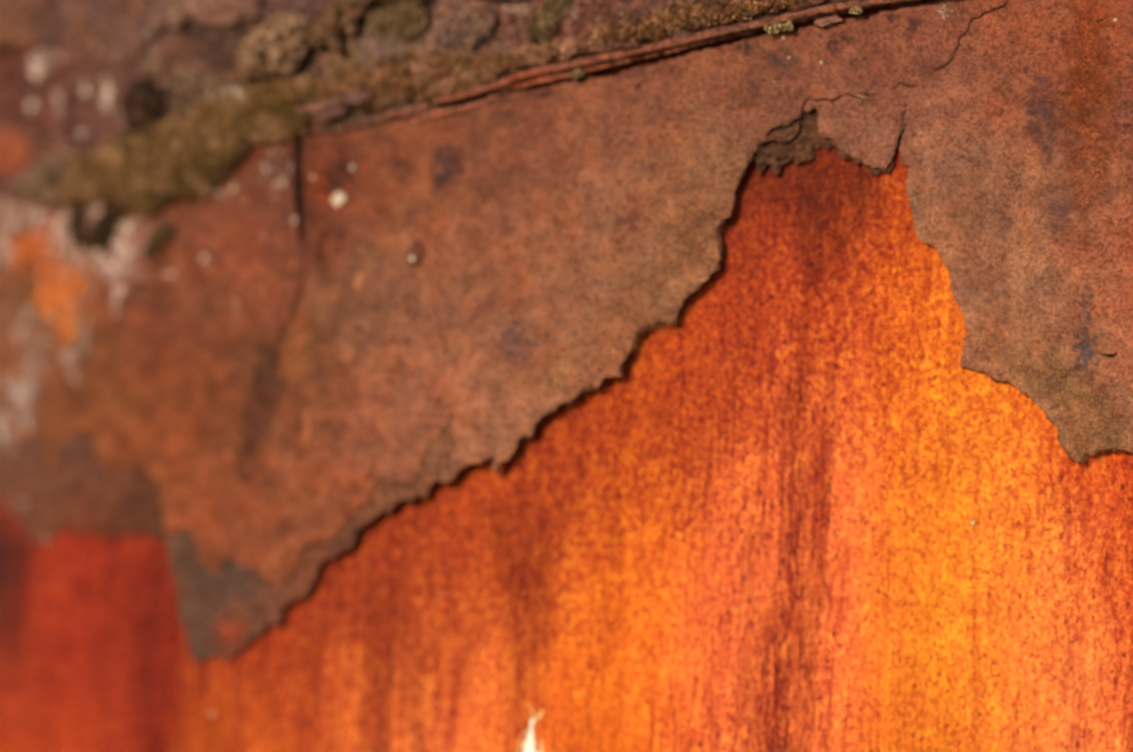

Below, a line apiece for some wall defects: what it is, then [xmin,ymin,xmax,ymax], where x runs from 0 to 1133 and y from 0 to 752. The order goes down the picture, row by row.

corrosion [0,0,333,71]
corrosion [434,0,924,103]
corrosion [1059,6,1107,117]
corrosion [0,127,29,174]
corrosion [120,73,161,130]
corrosion [338,100,431,133]
corrosion [1076,111,1103,144]
crack [292,139,306,239]
peeling [332,192,346,207]
corrosion [1070,164,1108,211]
corrosion [176,152,306,342]
corrosion [762,358,804,752]